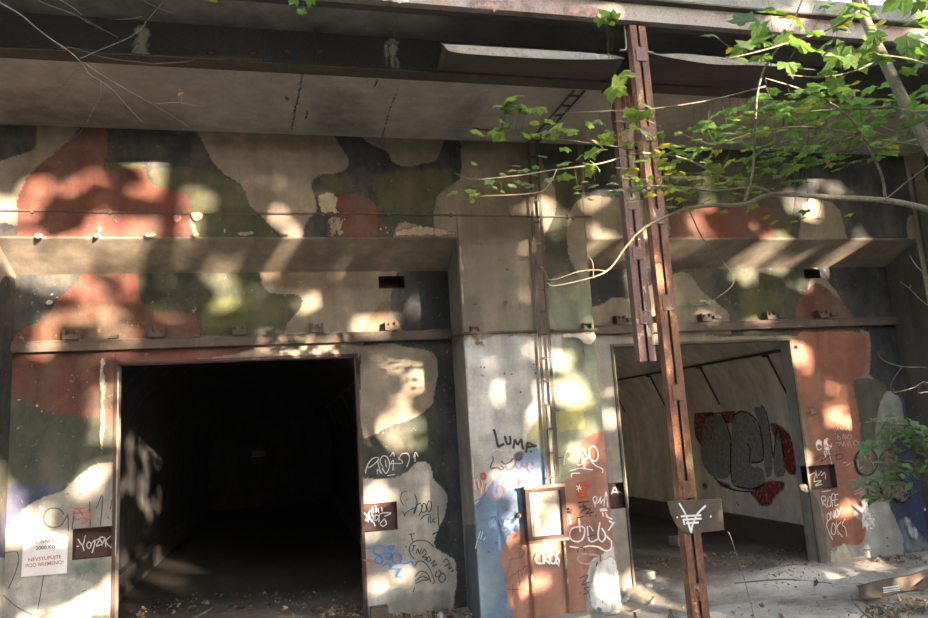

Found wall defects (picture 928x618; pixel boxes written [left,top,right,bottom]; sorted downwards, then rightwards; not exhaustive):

crack [285,74,308,127]
peeling [318,192,346,238]